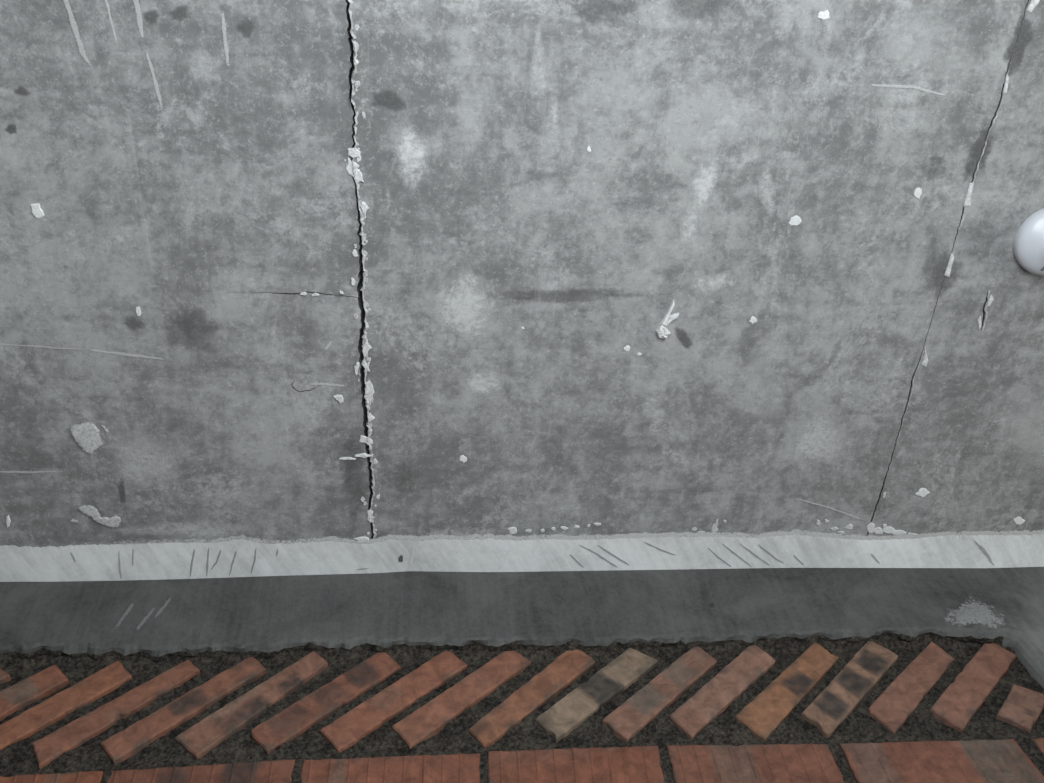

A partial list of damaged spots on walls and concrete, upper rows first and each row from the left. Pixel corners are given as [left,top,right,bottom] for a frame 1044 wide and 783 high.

crack [227,0,380,543]